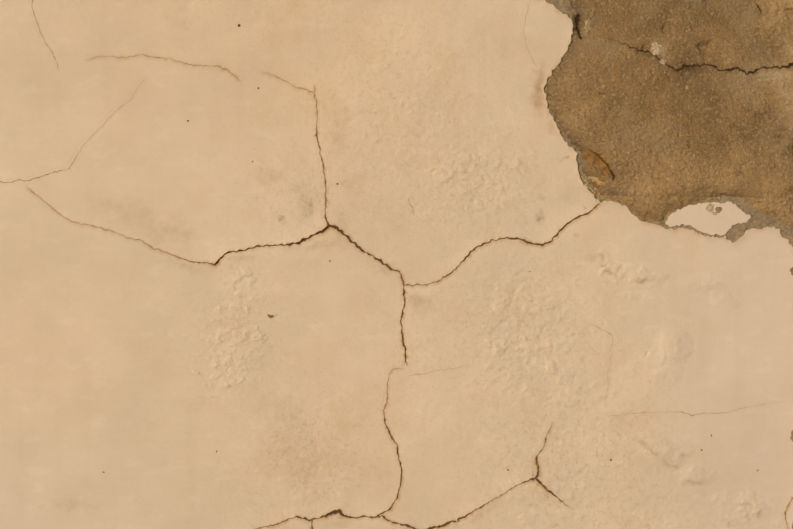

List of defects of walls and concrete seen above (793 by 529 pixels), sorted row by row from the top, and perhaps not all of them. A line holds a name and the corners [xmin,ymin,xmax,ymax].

crack [29,0,63,73]
crack [572,11,793,79]
spalling [546,0,793,236]
crack [584,146,619,183]
crack [0,51,602,529]